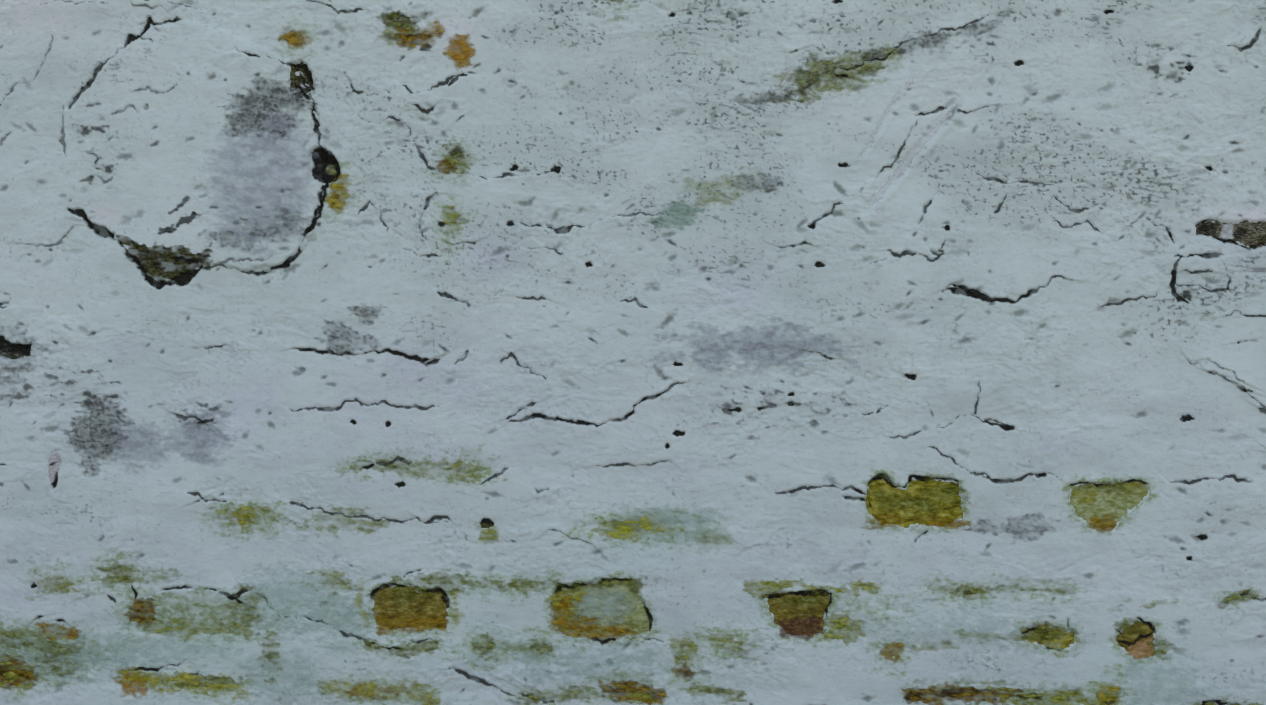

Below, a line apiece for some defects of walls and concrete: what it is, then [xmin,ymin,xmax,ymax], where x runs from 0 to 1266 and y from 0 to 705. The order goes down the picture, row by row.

spalling [1195,220,1266,249]
crack [876,243,1064,304]
crack [296,348,468,366]
crack [291,398,435,412]
crack [500,352,679,427]
crack [597,460,665,468]
spalling [843,470,970,541]
spalling [1063,478,1156,531]
spalling [357,570,458,636]
spalling [545,572,663,645]
spalling [744,580,879,646]
spalling [1110,603,1167,663]